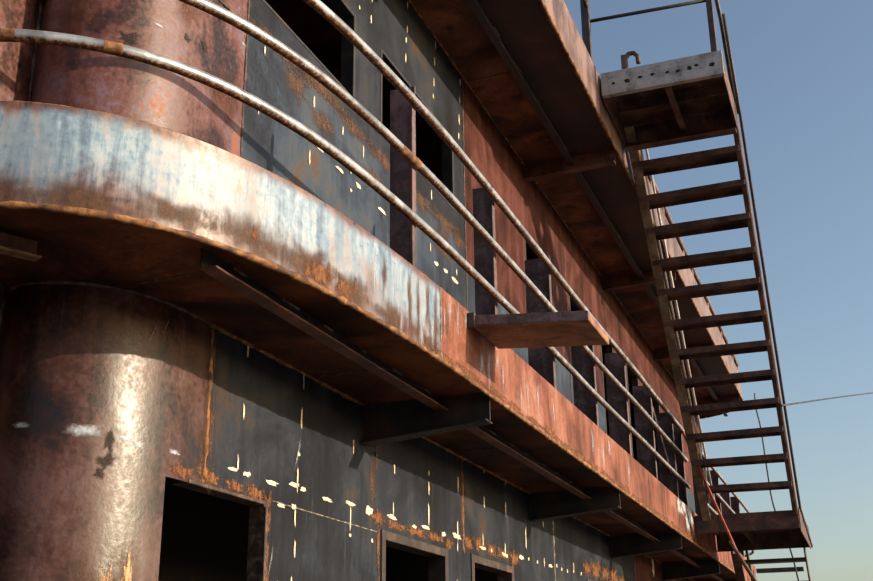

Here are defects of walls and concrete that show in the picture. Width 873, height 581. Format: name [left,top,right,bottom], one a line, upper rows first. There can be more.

rust [0,28,16,42]
rust [102,31,138,57]
rust [399,145,422,169]
rust [41,185,113,211]
rust [141,195,204,231]
rust [221,216,708,552]
rust [168,335,271,581]
rust [362,440,453,579]
rust [461,499,518,566]